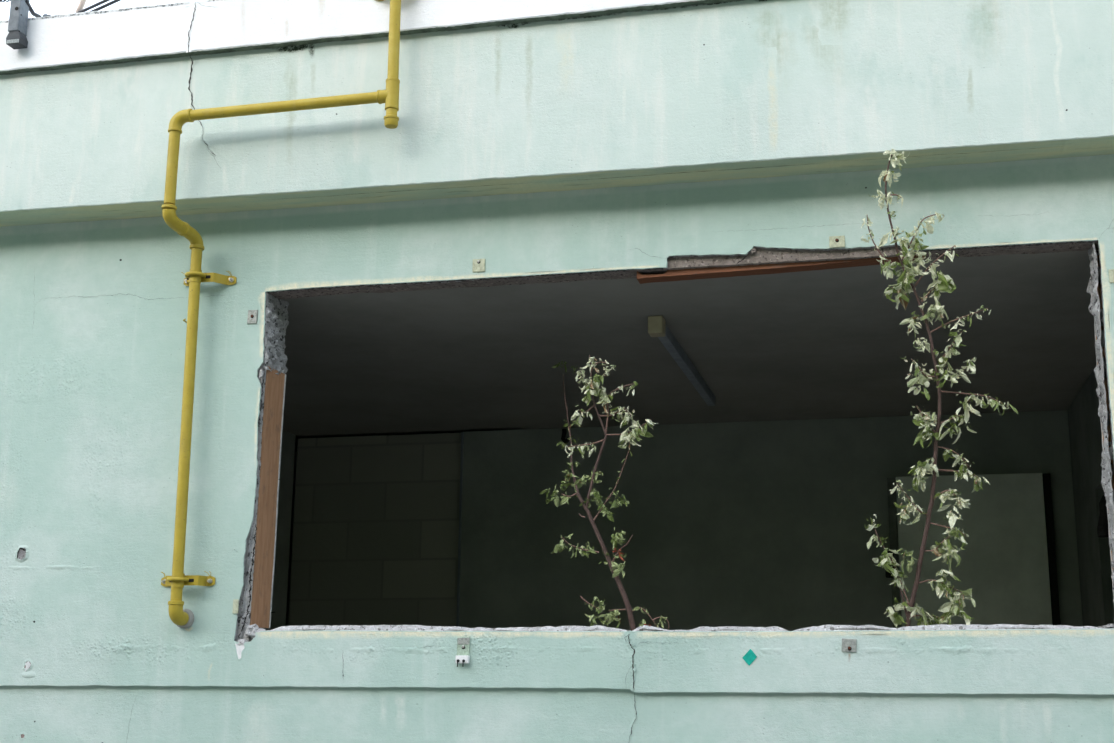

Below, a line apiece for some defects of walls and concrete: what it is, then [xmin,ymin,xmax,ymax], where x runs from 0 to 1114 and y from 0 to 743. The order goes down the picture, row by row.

crack [186,2,220,167]
spalling [234,241,1114,662]
peeling [15,545,29,563]
crack [625,633,655,743]